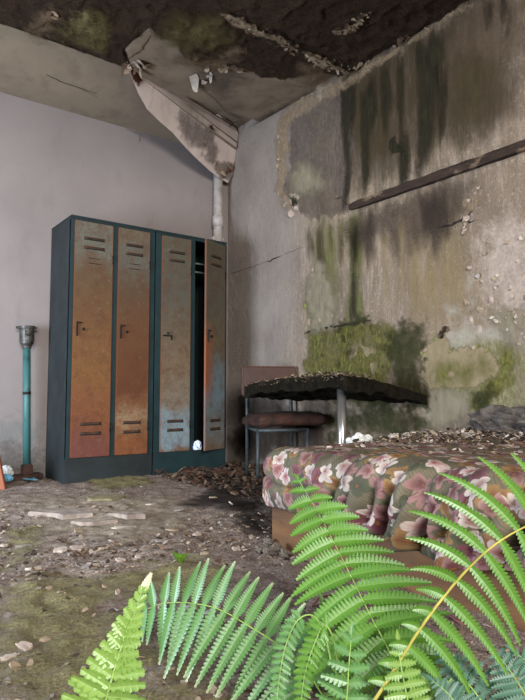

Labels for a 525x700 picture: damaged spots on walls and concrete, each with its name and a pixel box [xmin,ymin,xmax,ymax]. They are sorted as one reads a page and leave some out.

leakage [58,10,109,53]
leakage [180,114,217,163]
flaking render [0,0,473,218]
leakage [341,0,523,202]
crack [234,247,302,273]
leakage [341,182,464,261]
crack [432,210,475,231]
flaking render [419,326,501,430]